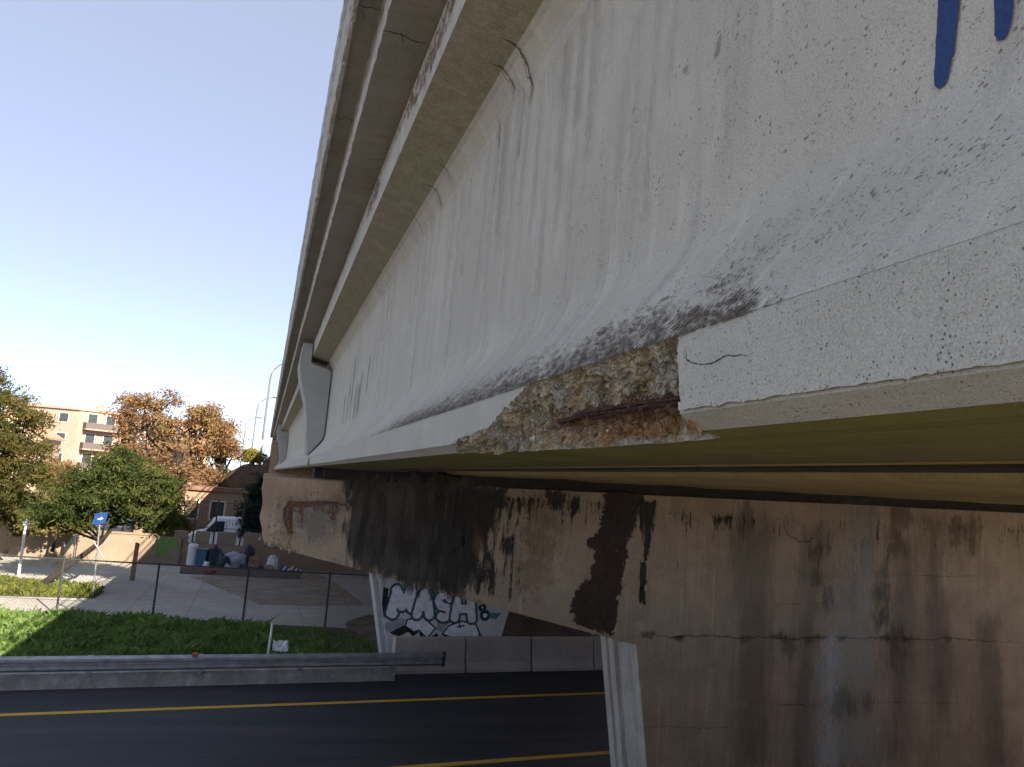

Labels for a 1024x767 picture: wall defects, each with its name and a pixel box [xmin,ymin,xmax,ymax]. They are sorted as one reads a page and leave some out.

crack [491,38,533,150]
leakage [371,137,986,436]
spalling [454,337,722,455]
crack [684,351,748,365]
leakage [340,469,657,637]
leakage [711,512,808,539]